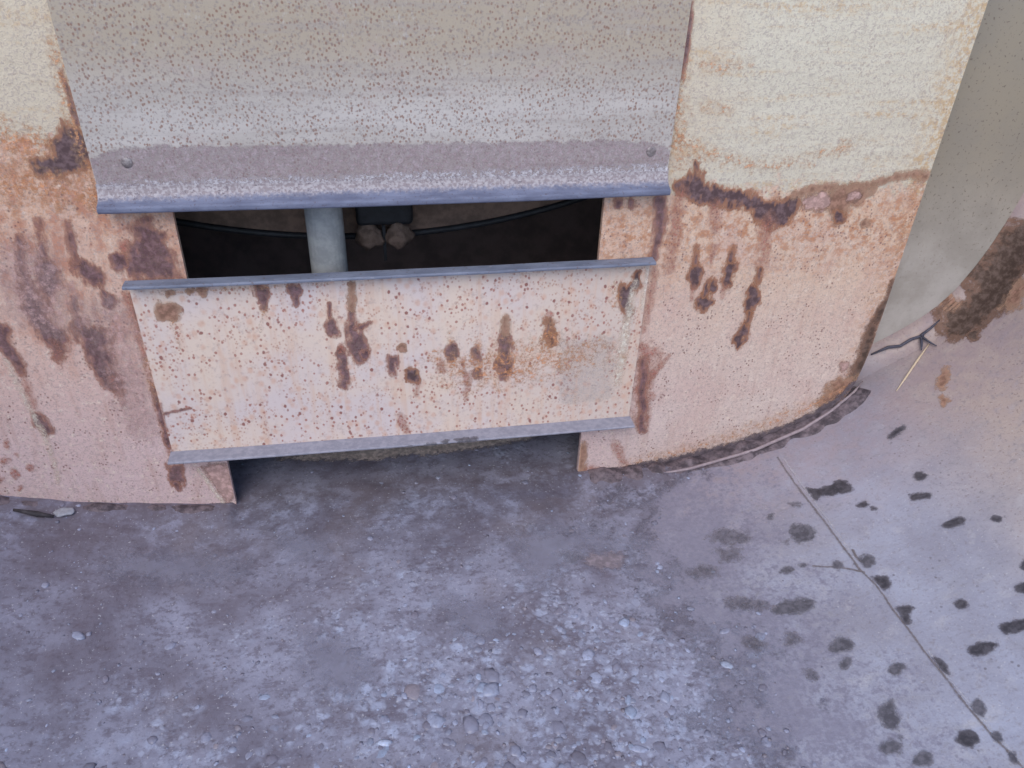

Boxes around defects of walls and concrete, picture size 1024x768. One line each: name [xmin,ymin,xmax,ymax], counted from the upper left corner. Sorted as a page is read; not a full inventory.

corrosion [0,38,208,492]
corrosion [613,98,930,351]
corrosion [931,217,1024,344]
corrosion [324,281,372,390]
corrosion [429,312,601,397]
corrosion [722,279,895,444]
water stain [807,480,852,500]
water stain [858,554,891,590]
crack [777,457,1024,768]
water stain [967,619,1024,656]
water stain [878,699,903,754]
water stain [955,729,1003,749]